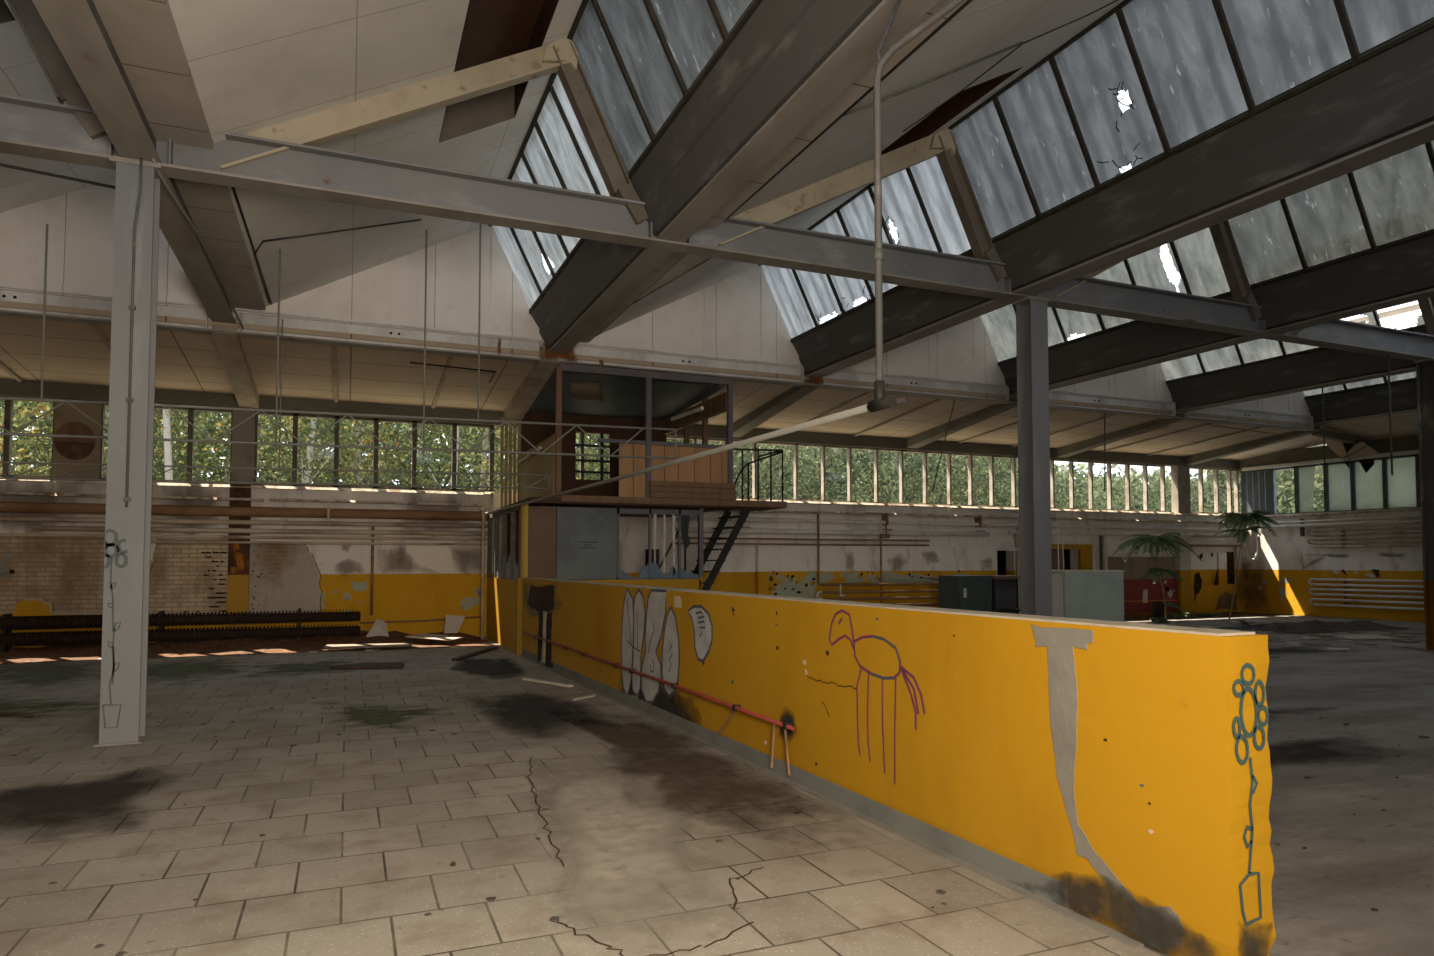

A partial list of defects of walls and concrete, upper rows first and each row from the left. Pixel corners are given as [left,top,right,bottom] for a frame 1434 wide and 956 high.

leakage [0,773,159,828]
crack [527,757,565,867]
crack [554,867,764,956]
leakage [1056,875,1210,956]
leakage [1240,930,1267,956]